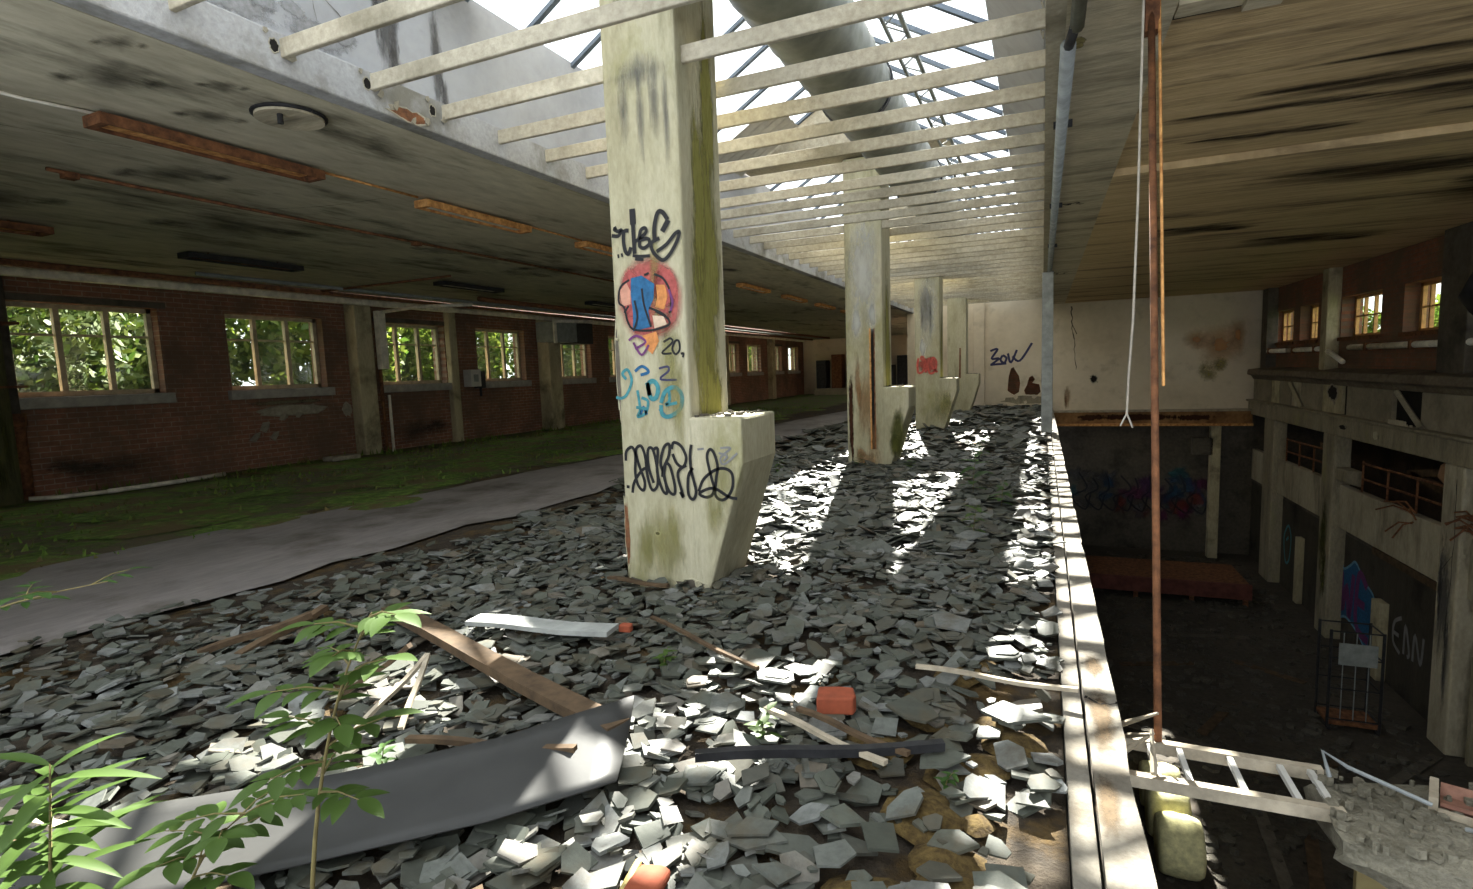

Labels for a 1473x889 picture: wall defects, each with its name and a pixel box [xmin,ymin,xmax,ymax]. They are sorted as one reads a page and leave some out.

damp [380,23,399,67]
damp [435,73,448,105]
damp [1176,40,1473,121]
damp [1192,124,1349,143]
damp [691,59,714,295]
damp [1274,155,1473,196]
damp [1158,223,1367,245]
damp [707,359,722,414]